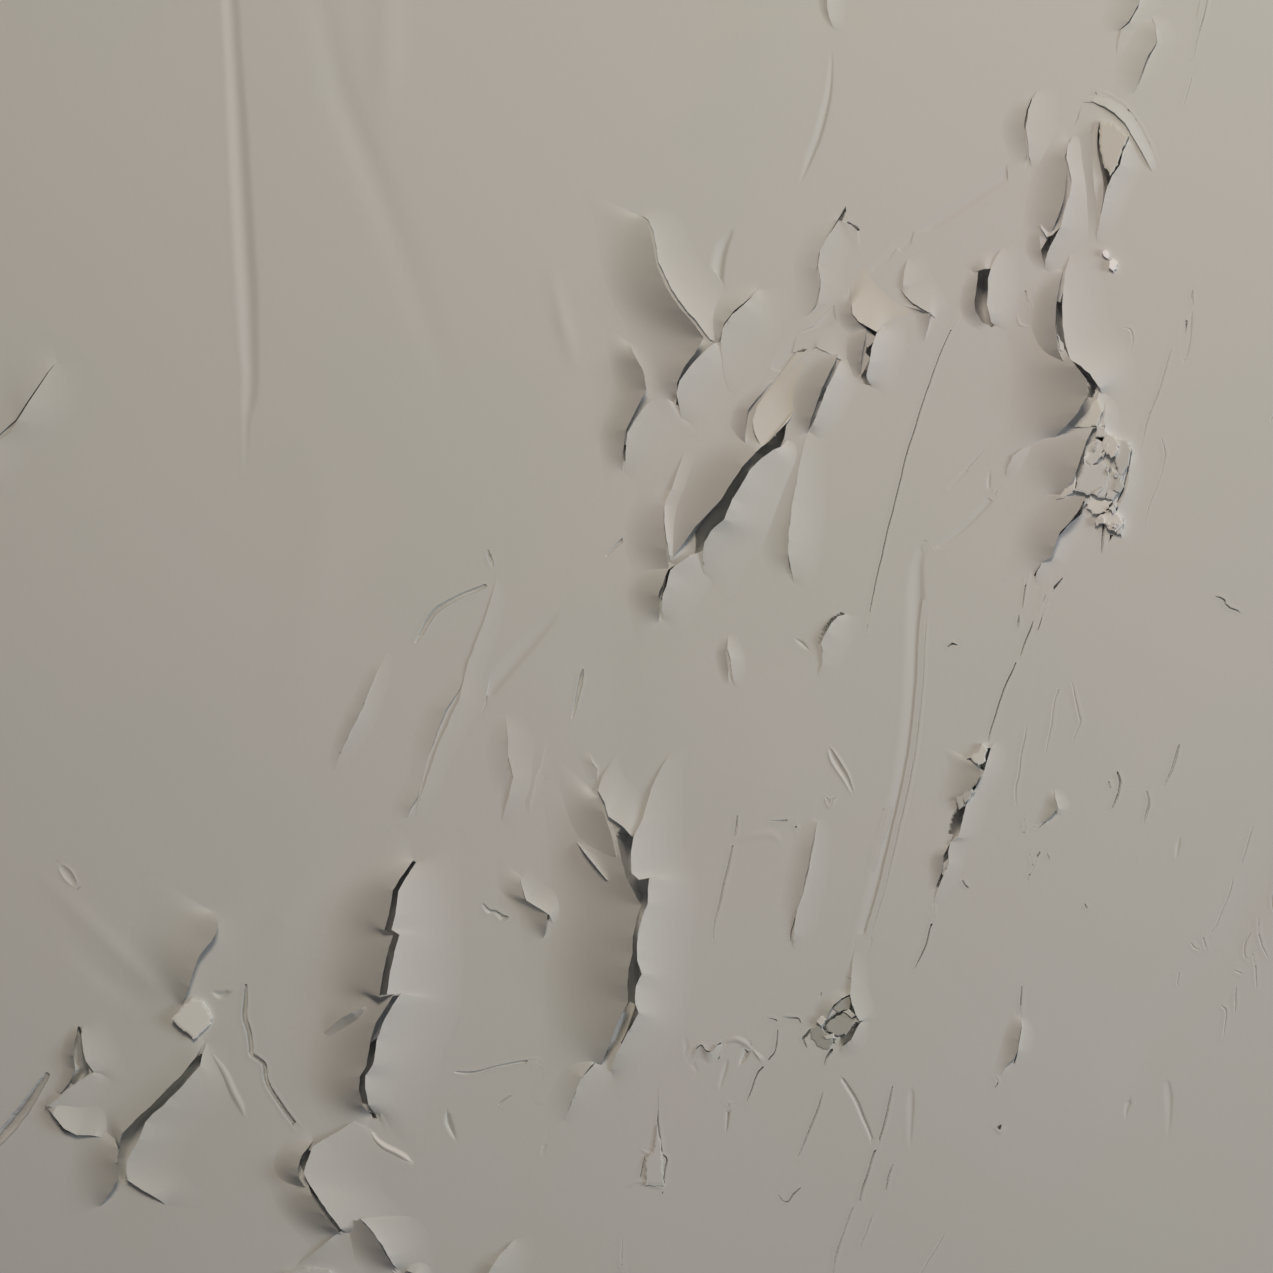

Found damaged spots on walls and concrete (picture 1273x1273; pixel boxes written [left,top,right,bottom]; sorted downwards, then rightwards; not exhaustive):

peeling [584,0,1178,641]
peeling [715,633,746,688]
peeling [928,739,1006,919]
peeling [0,998,231,1219]
peeling [265,688,769,1273]
peeling [814,933,878,1058]
crack [989,983,1034,1093]